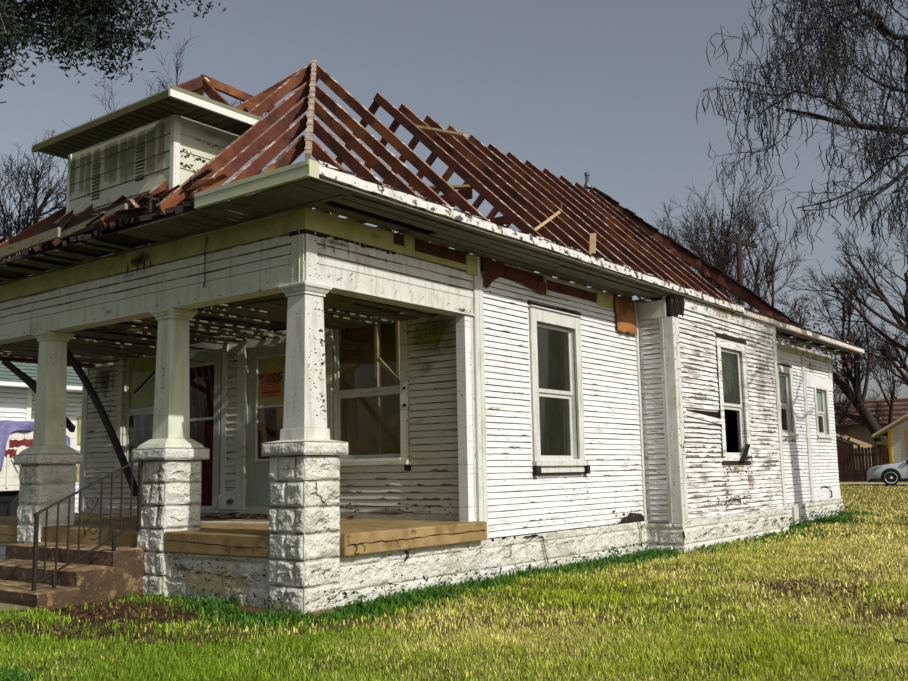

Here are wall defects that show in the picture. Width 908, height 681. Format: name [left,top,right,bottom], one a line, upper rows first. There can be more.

peeling [650,300,799,547]
peeling [363,472,450,513]
crack [347,529,487,561]
crack [504,534,549,567]
spalling [489,484,644,570]
spalling [260,553,426,611]